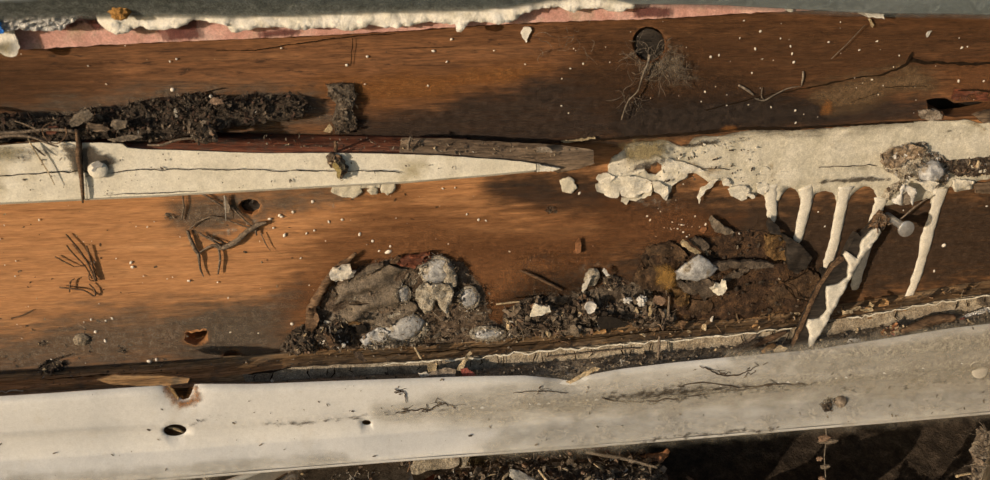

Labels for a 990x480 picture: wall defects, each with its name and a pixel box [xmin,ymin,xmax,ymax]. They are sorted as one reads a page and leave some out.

crack [559,52,990,143]
damp [0,173,990,375]
rust [164,385,200,408]